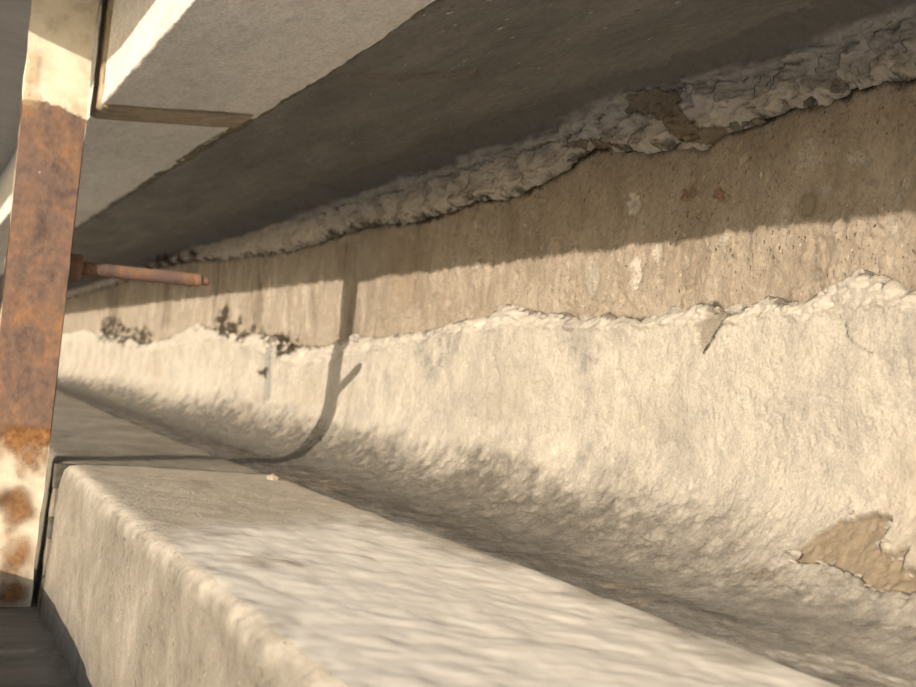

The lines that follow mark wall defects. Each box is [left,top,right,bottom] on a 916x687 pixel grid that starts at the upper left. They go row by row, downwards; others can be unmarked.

corrosion [0,97,86,470]
damp [63,250,311,399]
flaking render [62,74,916,351]
corrosion [0,540,28,604]
corrosion [0,489,31,524]